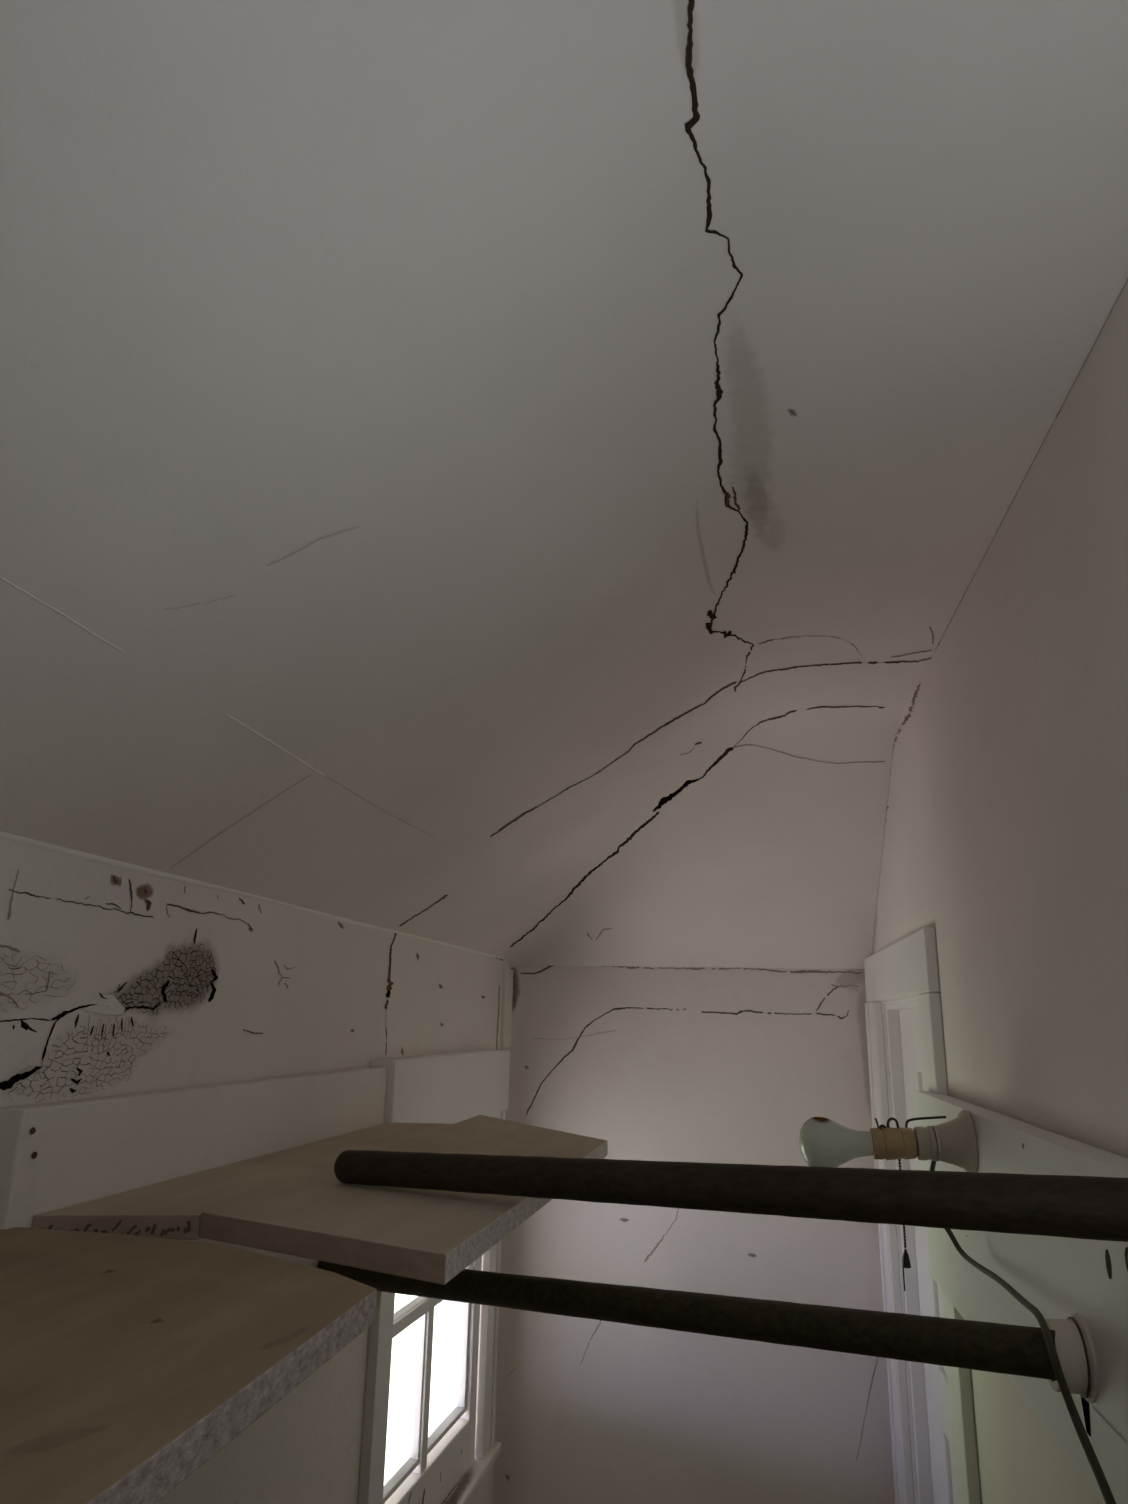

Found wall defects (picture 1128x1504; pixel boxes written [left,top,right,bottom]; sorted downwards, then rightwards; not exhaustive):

crack [490,0,1128,1115]
crack [0,869,262,1102]
crack [274,960,296,989]
crack [385,895,448,1054]